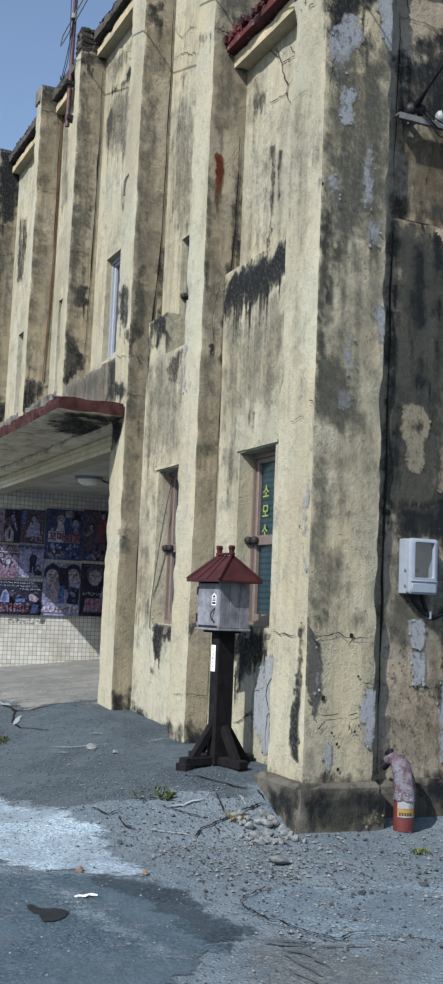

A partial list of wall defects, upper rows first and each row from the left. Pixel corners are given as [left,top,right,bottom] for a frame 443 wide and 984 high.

crack [270,46,305,105]
peeling [329,13,364,126]
peeling [376,0,393,50]
water stain [0,148,41,322]
water stain [47,0,182,450]
corrosion [214,152,224,210]
water stain [202,145,286,419]
water stain [23,345,48,415]
water stain [314,0,443,709]
peeling [246,654,273,755]
peeling [354,689,376,748]
peeling [388,618,443,763]